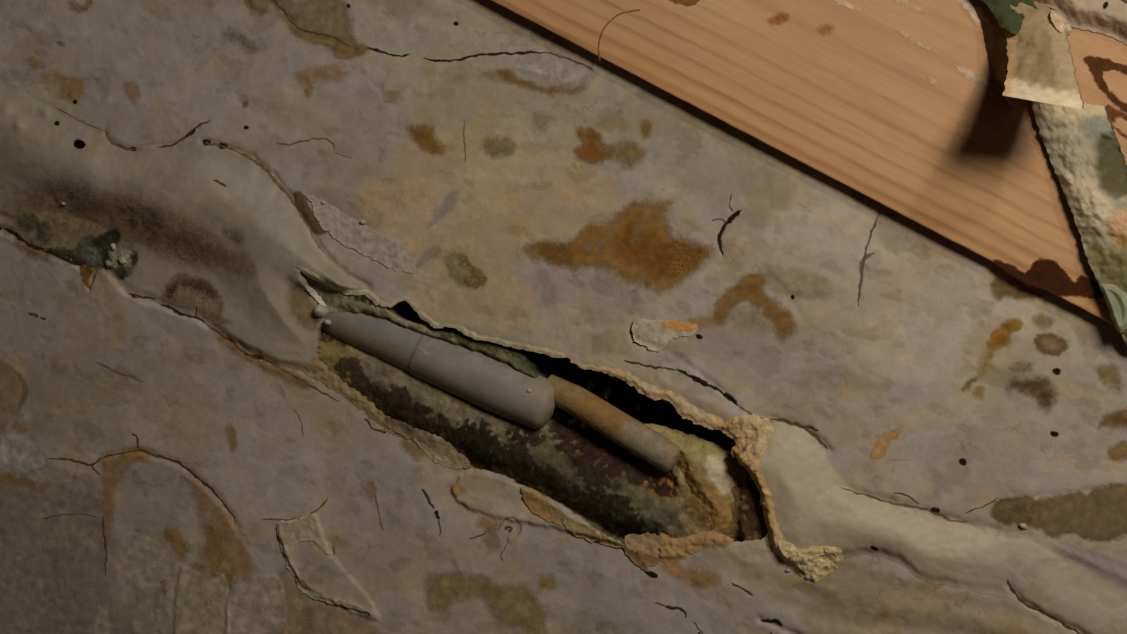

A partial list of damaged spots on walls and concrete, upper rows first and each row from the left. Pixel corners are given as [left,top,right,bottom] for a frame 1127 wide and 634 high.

crack [274,0,593,70]
corrosion [575,121,651,167]
damp [6,189,247,280]
flaking render [303,194,418,273]
corrosion [526,201,709,290]
crack [713,193,742,254]
corrosion [690,270,829,338]
spalling [294,266,844,583]
crack [40,513,107,575]
crack [46,433,328,523]
flaking render [174,513,371,634]
damp [992,484,1127,541]